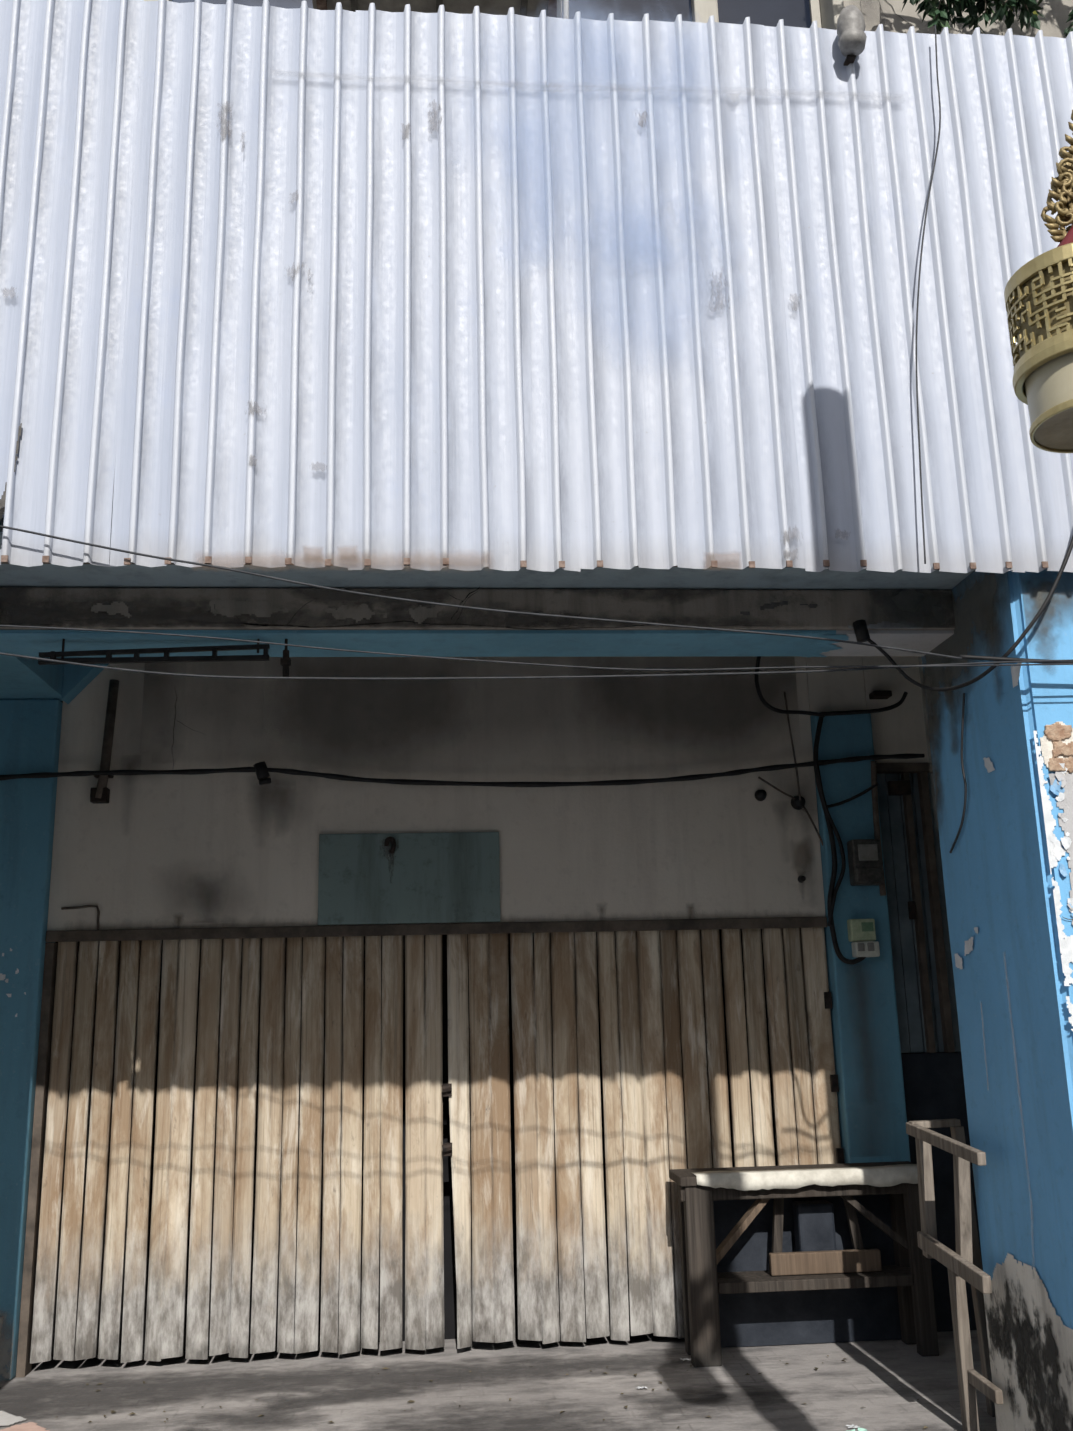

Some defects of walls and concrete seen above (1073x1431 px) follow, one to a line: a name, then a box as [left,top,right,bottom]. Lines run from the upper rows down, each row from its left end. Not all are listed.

leakage [0,587,763,628]
leakage [1030,582,1073,632]
peeling [1033,722,1073,1031]
peeling [983,1253,1073,1431]
leakage [985,1281,1073,1431]